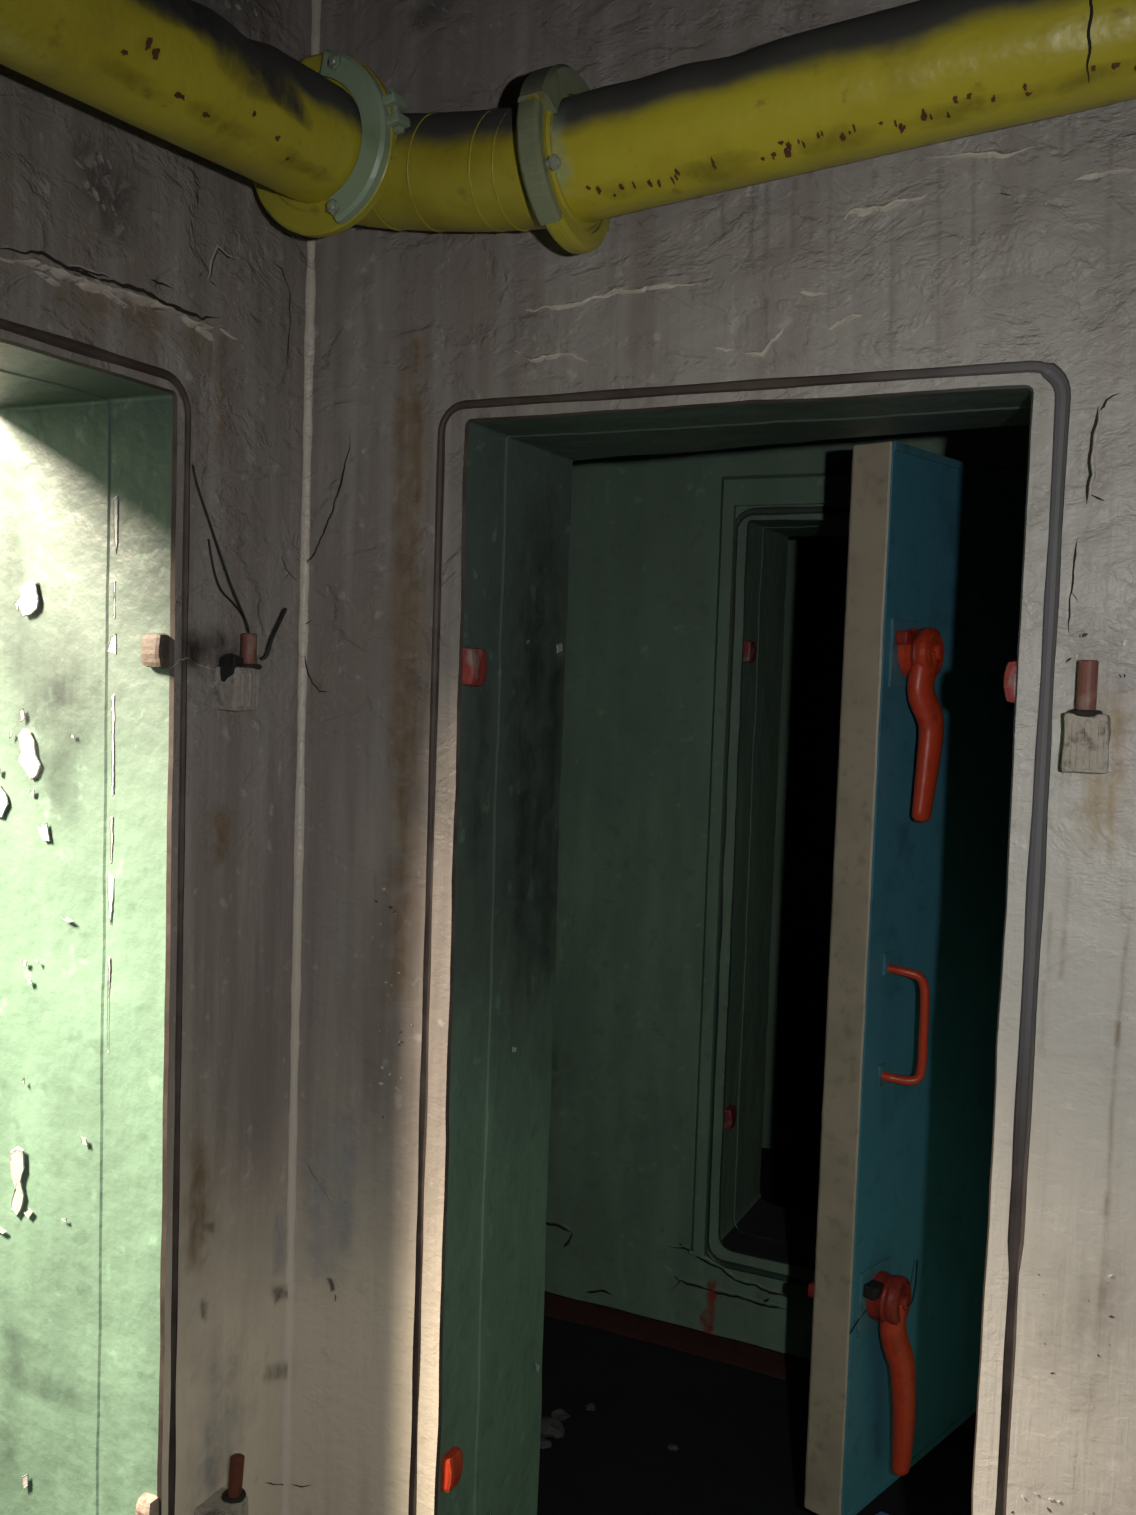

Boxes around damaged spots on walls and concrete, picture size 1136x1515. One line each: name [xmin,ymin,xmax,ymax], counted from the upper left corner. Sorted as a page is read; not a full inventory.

crack [70,264,109,278]
crack [208,244,291,363]
crack [1068,393,1119,631]
peeling [15,579,39,616]
peeling [9,708,41,796]
peeling [0,768,8,818]
peeling [37,822,50,841]
crack [546,1219,573,1247]
crack [586,1288,612,1296]
crack [669,1243,790,1310]